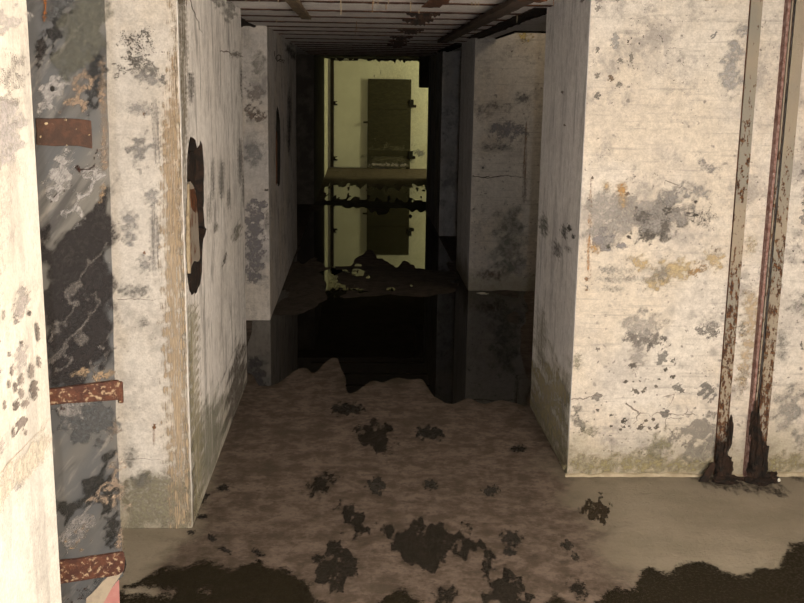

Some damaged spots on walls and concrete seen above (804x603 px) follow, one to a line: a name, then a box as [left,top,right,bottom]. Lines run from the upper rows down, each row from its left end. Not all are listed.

spalling [185,137,206,295]
rust [736,292,758,384]
crack [571,392,607,401]
crack [625,394,695,433]